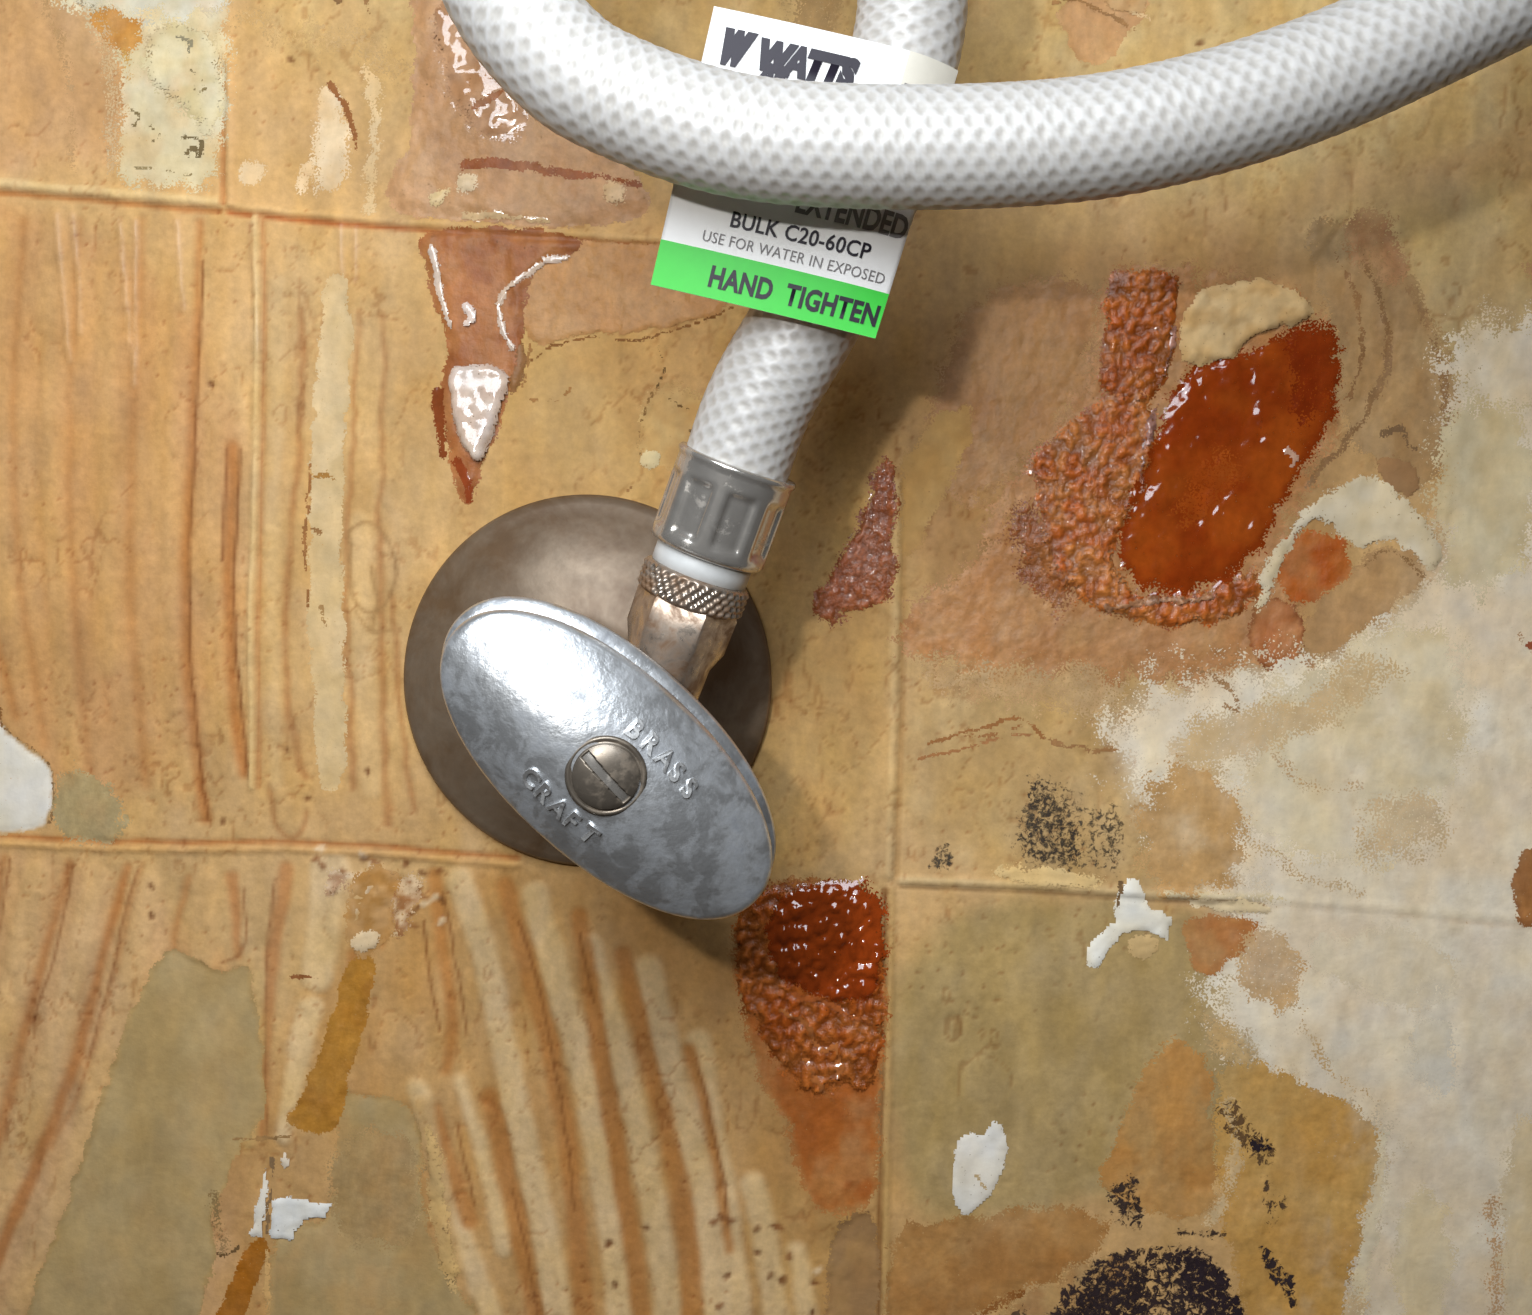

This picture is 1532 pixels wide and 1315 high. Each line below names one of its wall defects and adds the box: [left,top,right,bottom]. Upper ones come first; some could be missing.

corrosion [811,248,1354,700]
spalling [1179,277,1314,367]
peeling [0,707,133,848]
mould [928,843,953,869]
mould [1016,775,1124,872]
peeling [906,291,1532,1315]
corrosion [727,873,895,1219]
damp [879,1008,1384,1315]